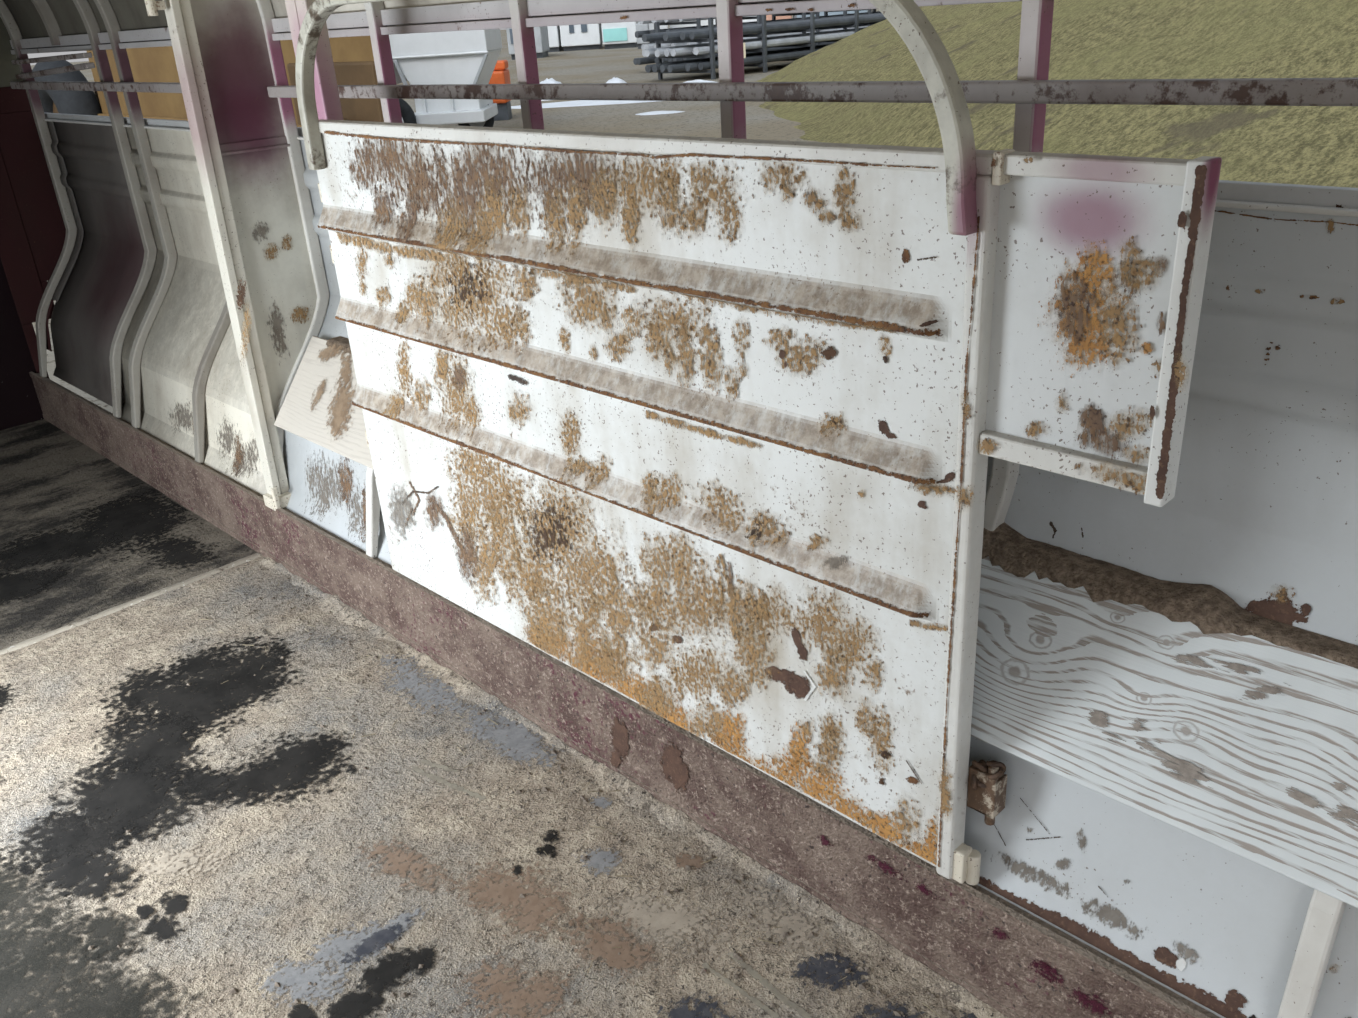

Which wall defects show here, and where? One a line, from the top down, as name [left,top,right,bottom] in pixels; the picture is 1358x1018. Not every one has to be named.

corrosion [252,221,292,260]
corrosion [236,275,251,365]
corrosion [1037,236,1167,495]
corrosion [1025,421,1052,438]
damp [0,483,221,606]
corrosion [318,131,1001,867]
peeling [1245,586,1311,626]
damp [0,632,359,1018]
damp [287,917,437,1018]